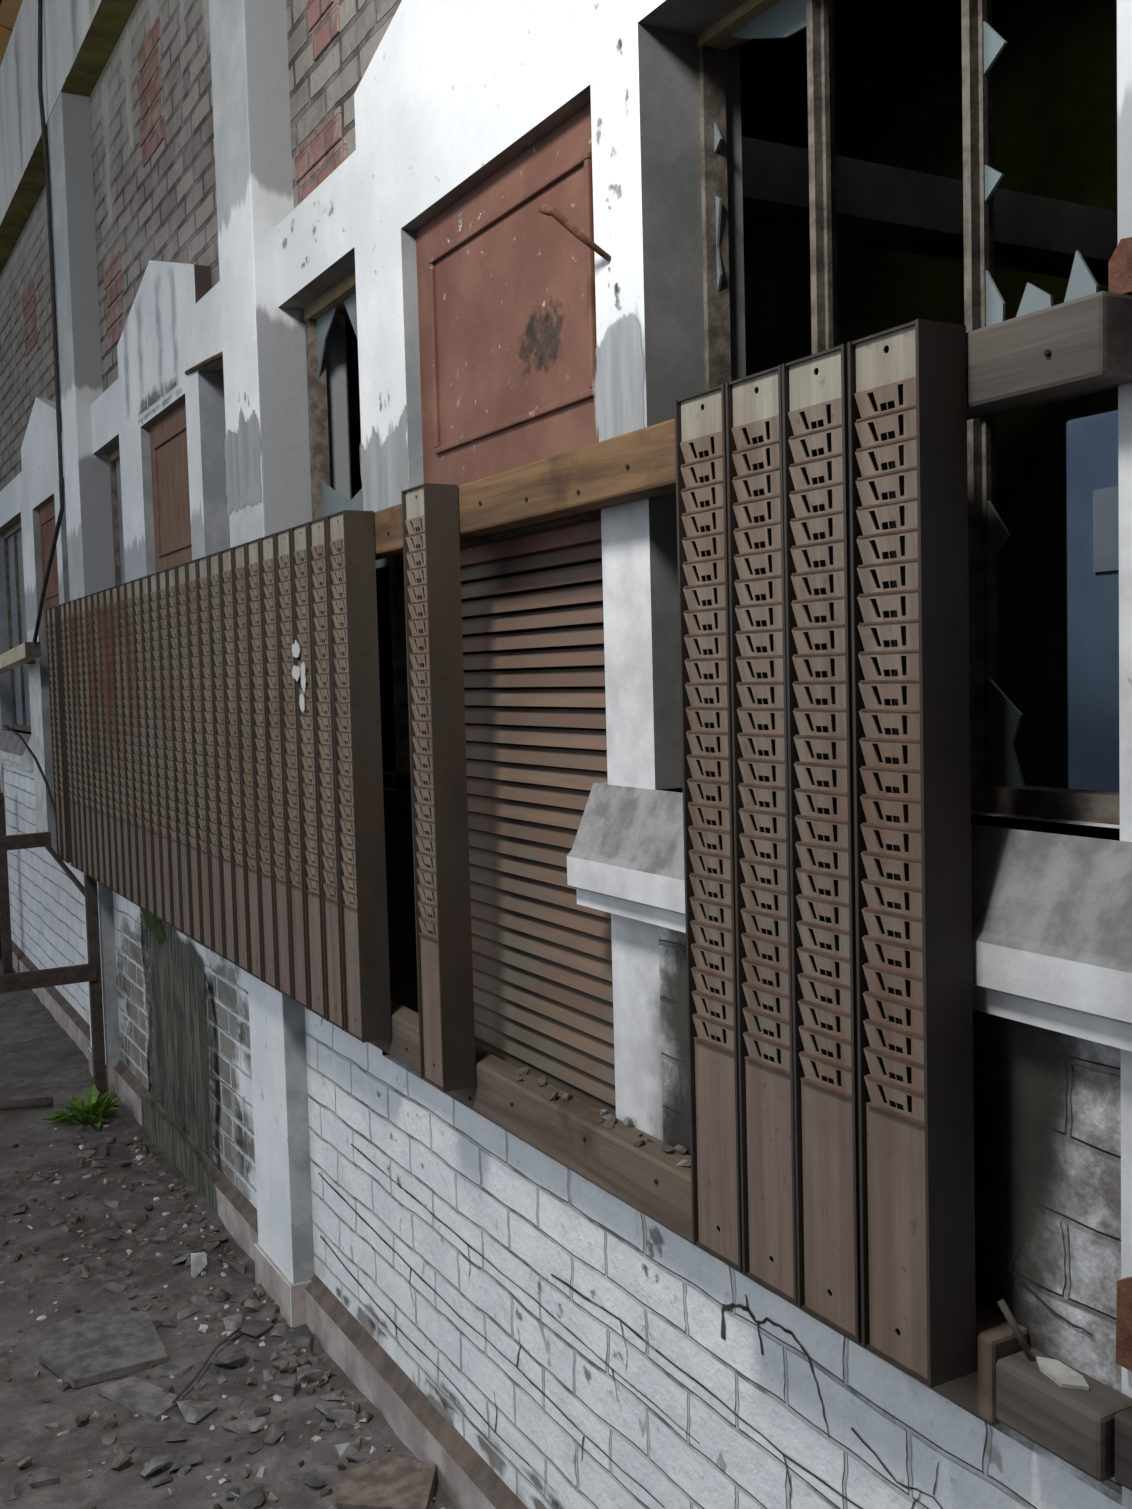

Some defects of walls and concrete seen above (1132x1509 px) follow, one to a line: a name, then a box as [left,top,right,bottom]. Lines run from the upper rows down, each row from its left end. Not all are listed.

peeling [593,267,645,441]
leakage [140,909,221,1213]
crack [318,1144,863,1509]
leakage [662,939,691,1156]
crack [721,1294,943,1509]
leakage [973,1010,1068,1352]